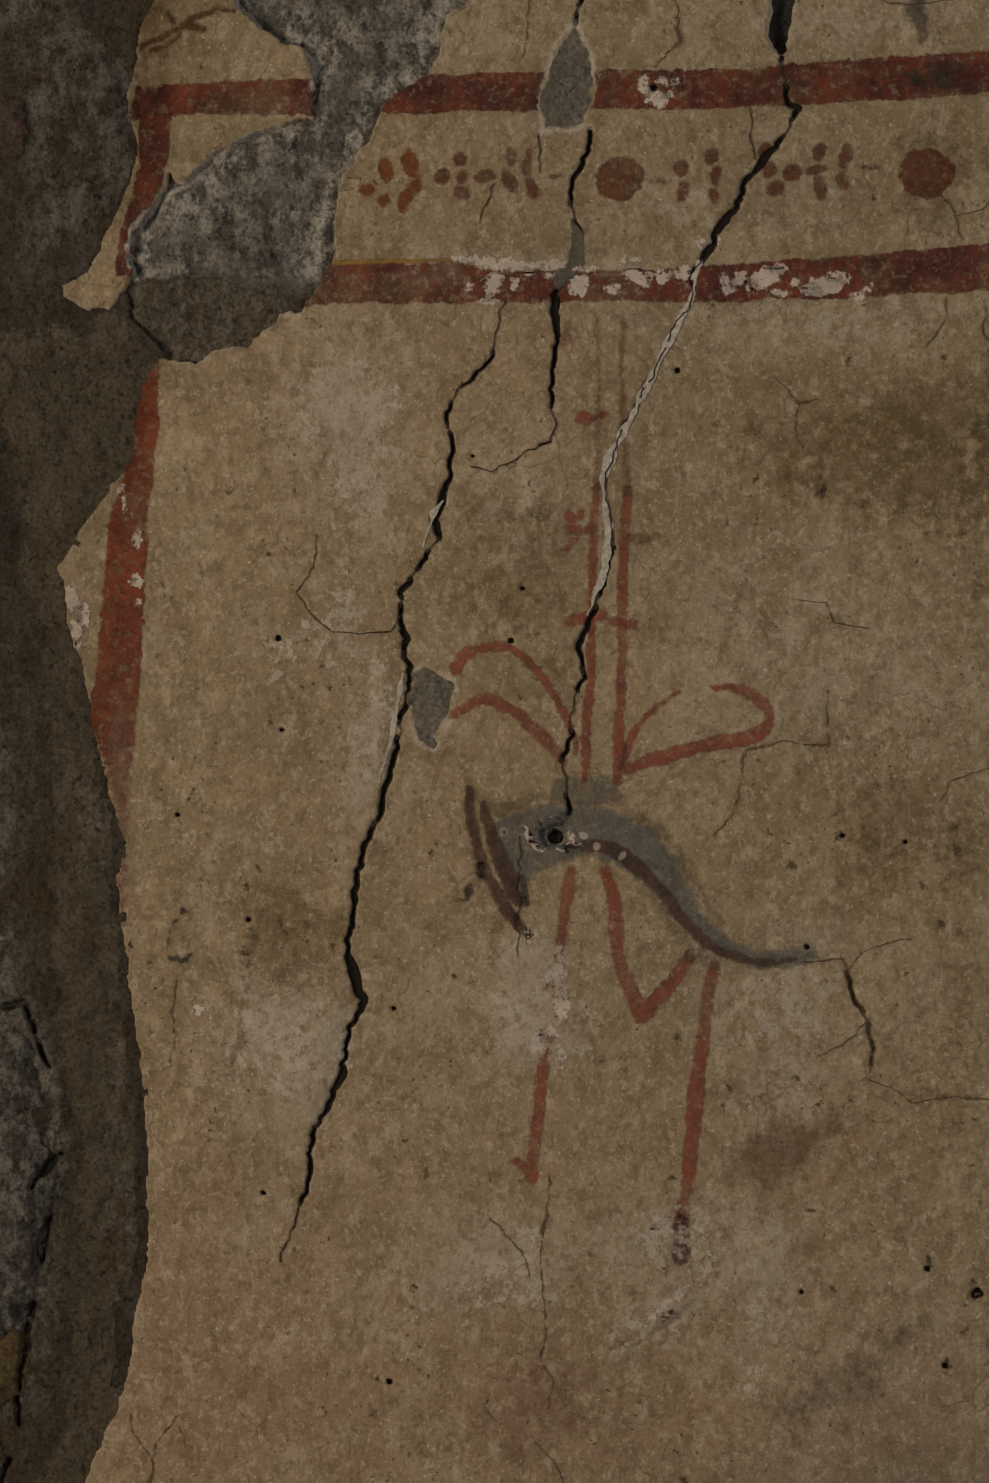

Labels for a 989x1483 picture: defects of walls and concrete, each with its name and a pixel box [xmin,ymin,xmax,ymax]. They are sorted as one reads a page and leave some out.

spalling [540,18,593,128]
crack [653,0,683,68]
peeling [451,231,727,306]
peeling [719,262,874,301]
crack [561,56,802,814]
crack [773,376,818,448]
spalling [0,0,468,1483]
crack [279,129,592,1262]
crack [713,690,830,836]
crack [803,938,989,1104]